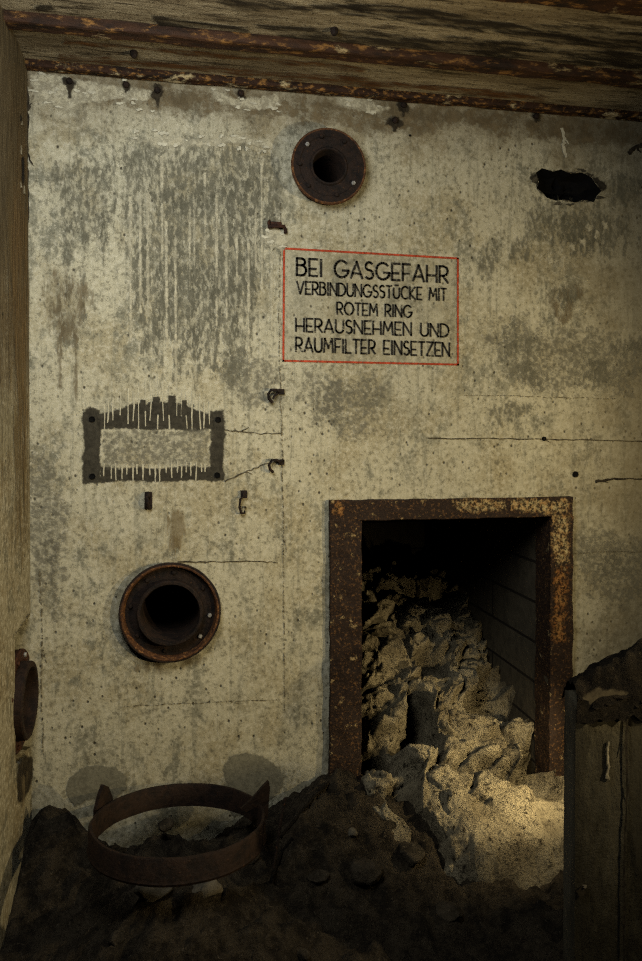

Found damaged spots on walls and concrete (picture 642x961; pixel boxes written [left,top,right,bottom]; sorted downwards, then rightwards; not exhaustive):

spalling [530,168,606,206]
leakage [48,137,284,408]
leakage [486,285,642,397]
leakage [296,371,388,441]
leakage [490,403,531,427]
corrosion [456,498,570,642]
spalling [577,687,642,716]